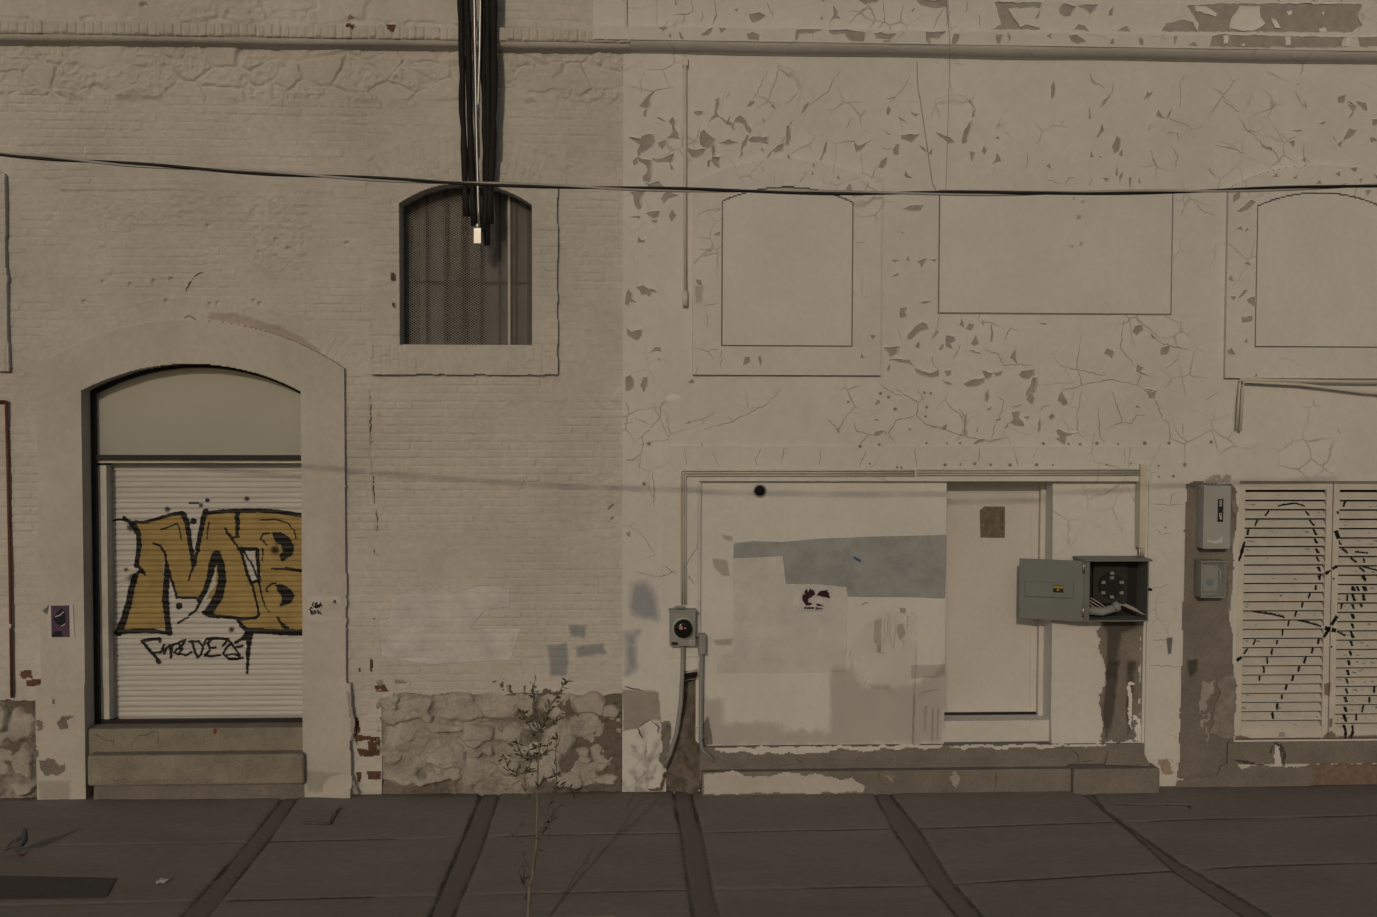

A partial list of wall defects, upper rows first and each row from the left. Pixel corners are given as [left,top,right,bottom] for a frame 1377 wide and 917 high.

peeling [794,0,897,43]
peeling [991,0,1144,45]
peeling [629,92,809,223]
peeling [878,100,1001,178]
peeling [1088,72,1141,189]
peeling [624,284,659,306]
peeling [624,373,649,393]
crack [626,303,780,506]
peeling [860,300,1078,445]
crack [819,315,1190,466]
peeling [1096,621,1142,743]
peeling [354,718,381,782]